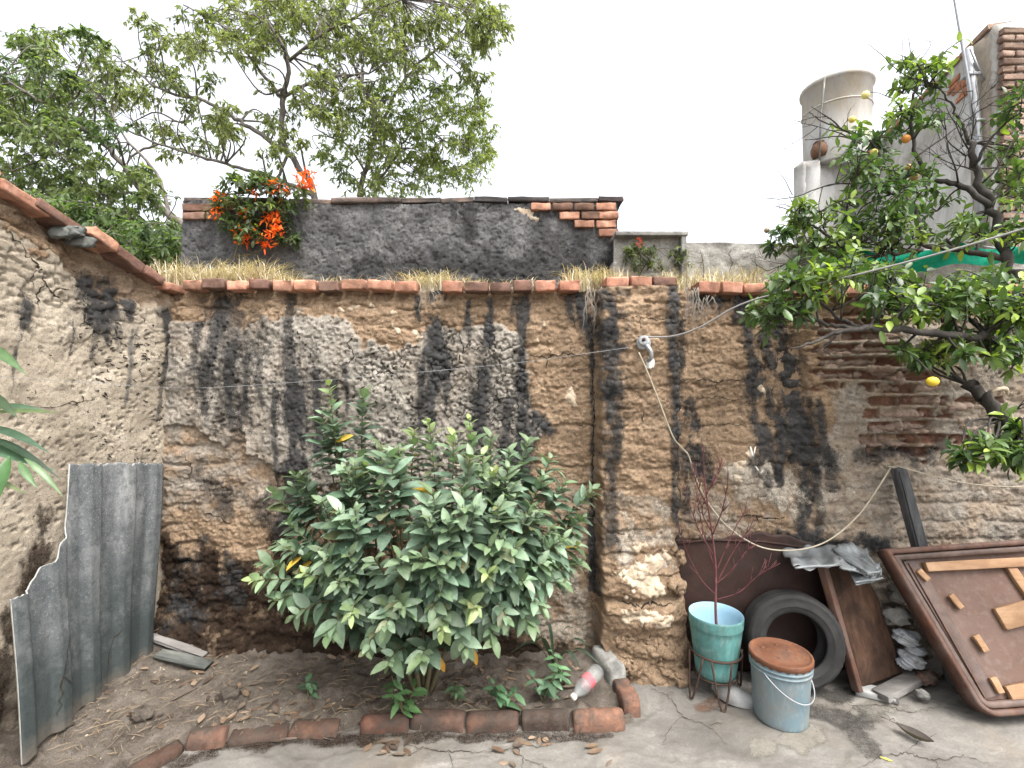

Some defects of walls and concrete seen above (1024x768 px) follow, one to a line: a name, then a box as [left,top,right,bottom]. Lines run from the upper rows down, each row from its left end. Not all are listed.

spalling [514,203,619,237]
crack [10,231,94,351]
water stain [70,271,138,406]
peeling [132,278,206,322]
water stain [154,291,386,659]
peeling [234,293,520,424]
water stain [349,202,856,658]
water stain [855,439,945,473]
spalling [815,332,993,450]
peeling [612,541,674,632]
crack [651,688,726,744]